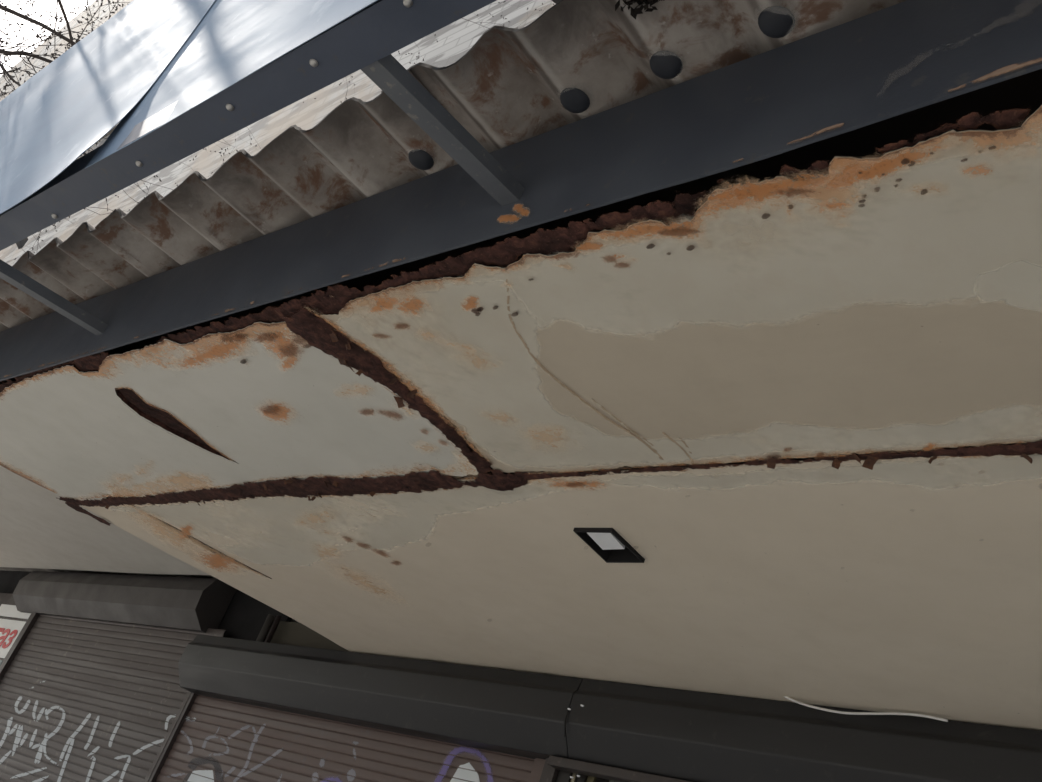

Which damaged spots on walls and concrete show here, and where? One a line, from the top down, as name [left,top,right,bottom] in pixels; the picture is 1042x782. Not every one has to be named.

corrosion [948,58,1042,92]
corrosion [0,106,1042,462]
peeling [338,146,1042,488]
crack [115,387,237,463]
corrosion [65,502,111,526]
crack [131,504,272,579]
peeling [105,478,548,566]
corrosion [342,536,399,565]